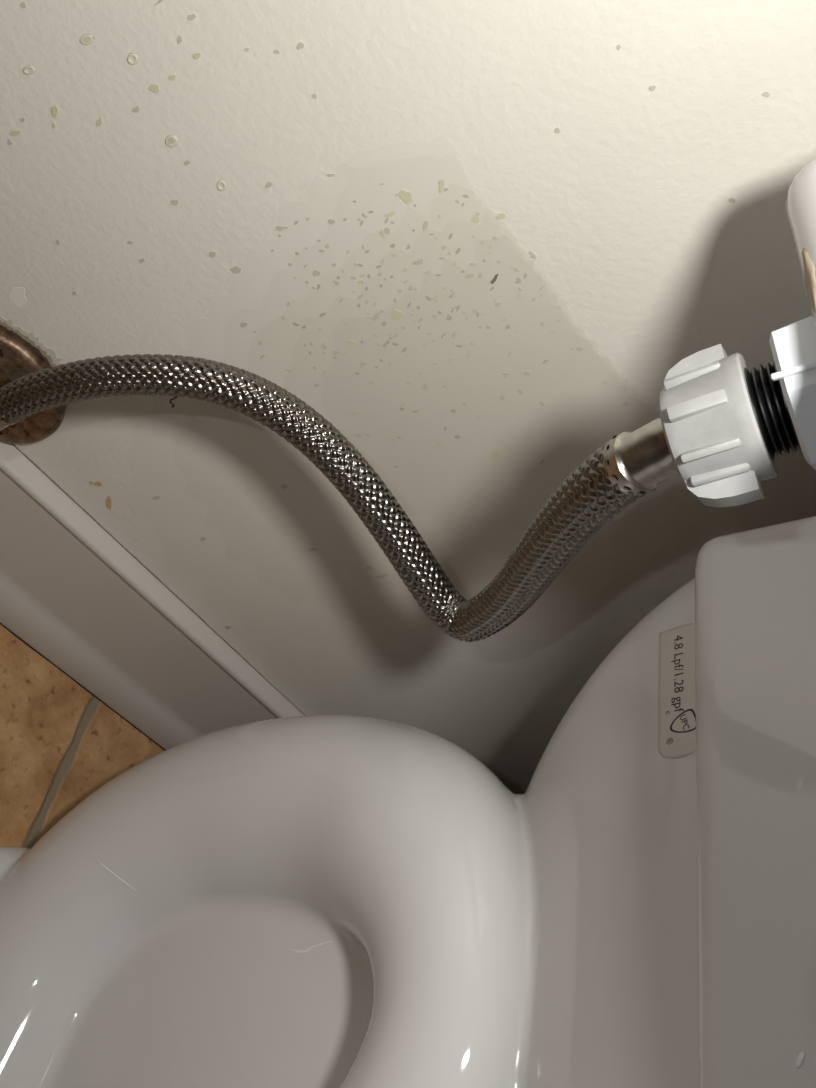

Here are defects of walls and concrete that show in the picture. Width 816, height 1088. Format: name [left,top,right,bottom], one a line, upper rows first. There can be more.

damp [170,136,660,600]